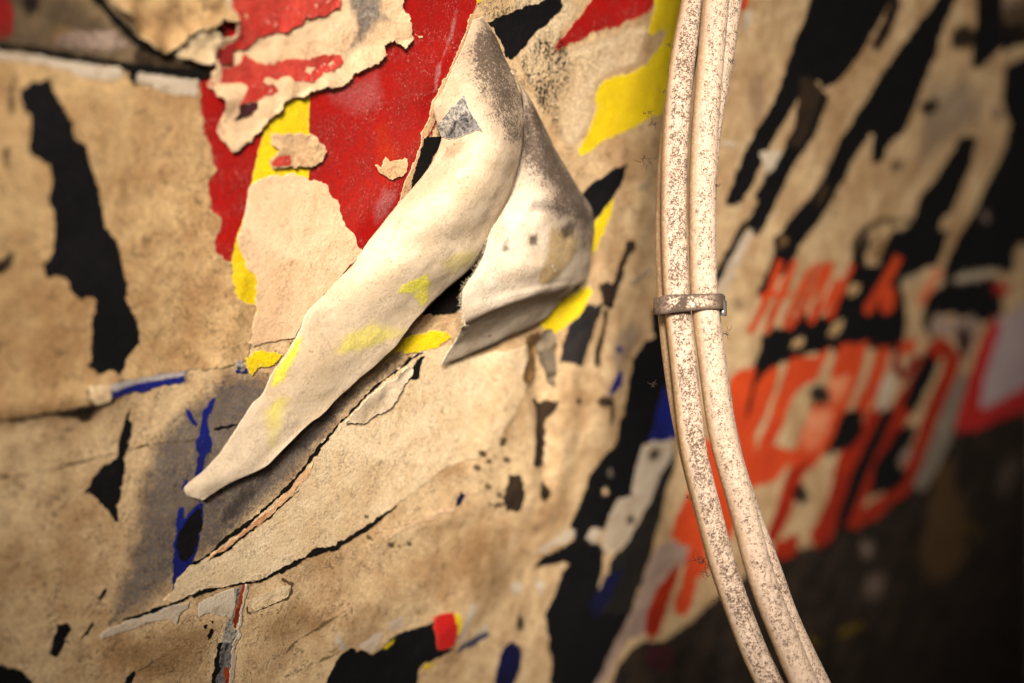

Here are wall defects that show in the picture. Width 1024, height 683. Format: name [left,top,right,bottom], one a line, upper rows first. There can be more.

peeling [184,17,595,500]
crack [0,422,240,479]
crack [122,506,397,620]
crack [187,352,425,567]